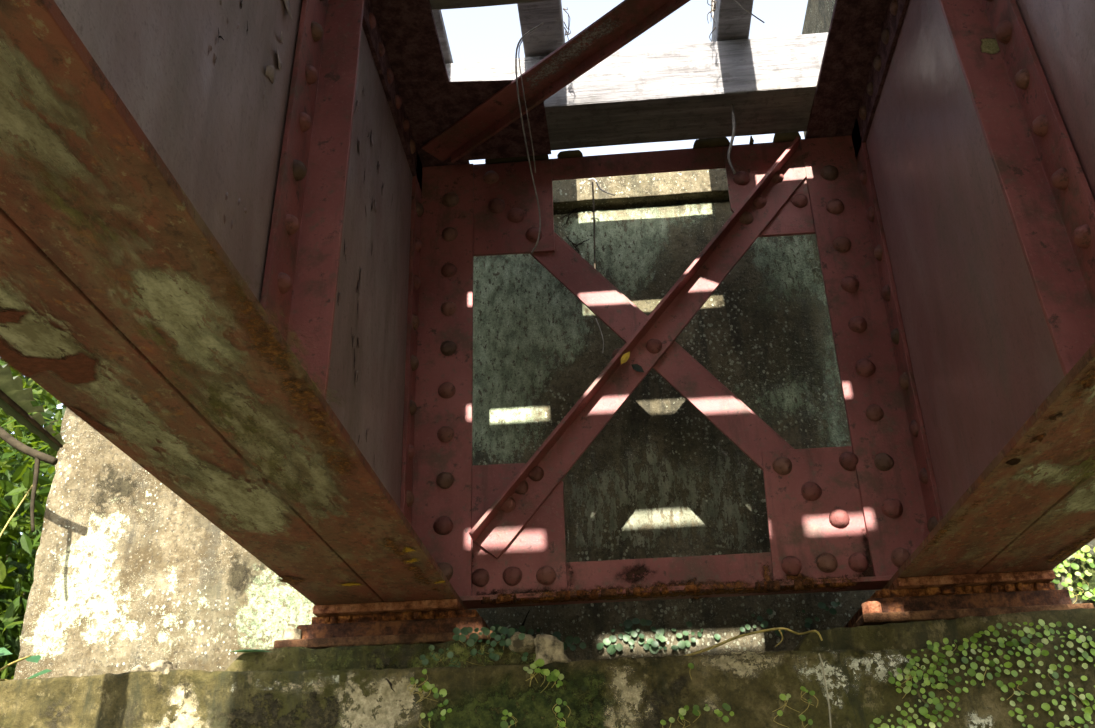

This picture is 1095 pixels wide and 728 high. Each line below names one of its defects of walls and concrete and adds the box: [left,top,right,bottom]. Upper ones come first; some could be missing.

leakage [0,40,346,534]
corrosion [0,310,28,324]
corrosion [0,340,98,385]
corrosion [65,405,121,435]
leakage [227,553,263,594]
leakage [155,681,208,728]
leakage [269,642,426,728]
leakage [604,666,651,728]
leakage [701,650,912,709]
leakage [968,713,993,728]